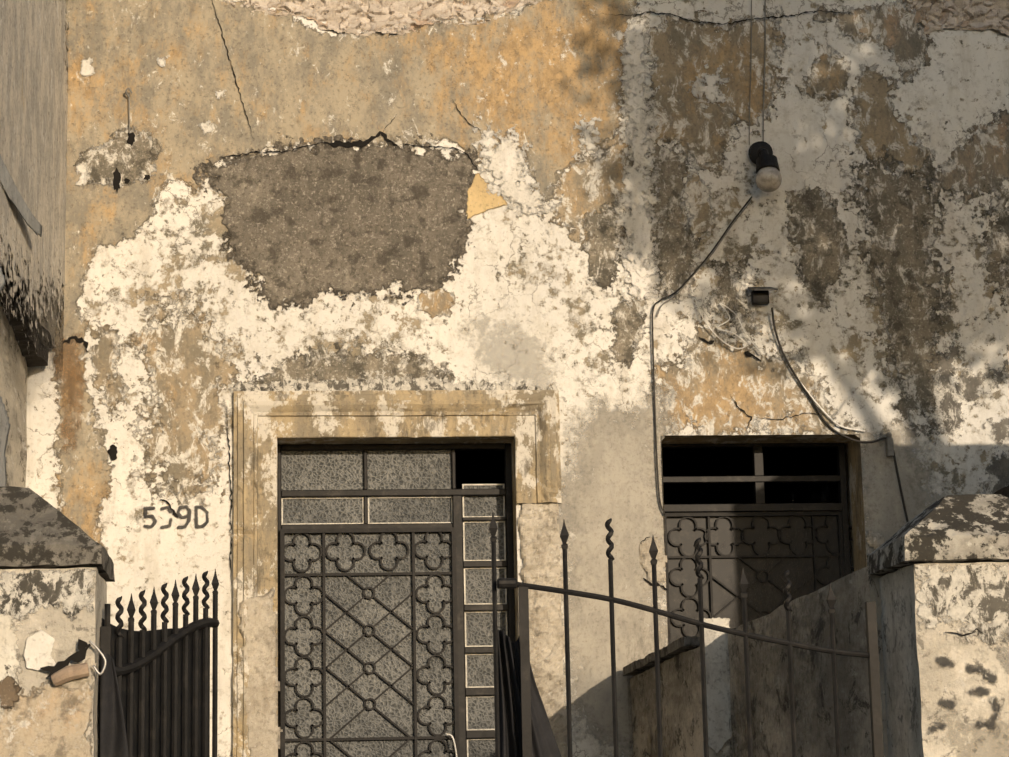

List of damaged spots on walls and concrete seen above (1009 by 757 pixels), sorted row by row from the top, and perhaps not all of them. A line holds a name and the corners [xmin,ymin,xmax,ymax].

crack [212,2,251,128]
crack [220,117,478,170]
peeling [0,0,1009,553]
mould [930,340,1009,446]
mould [979,415,1009,494]
peeling [0,613,96,757]
spalling [517,503,567,757]